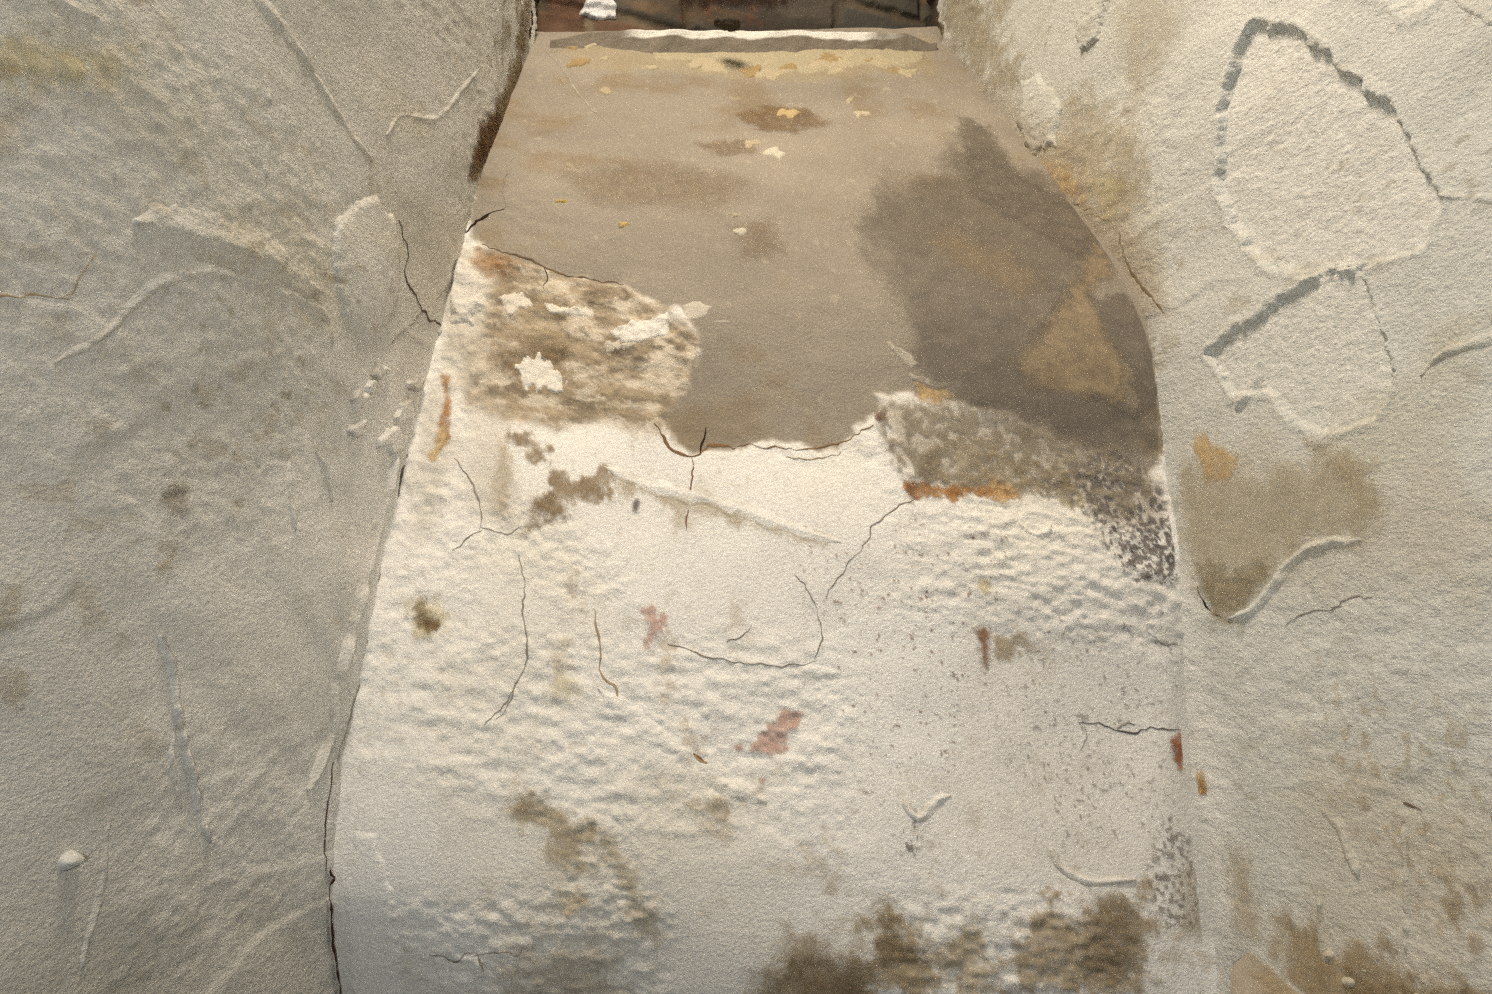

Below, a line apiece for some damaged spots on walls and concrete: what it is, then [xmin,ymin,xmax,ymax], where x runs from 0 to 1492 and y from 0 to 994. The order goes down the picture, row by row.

spalling [1214,26,1443,434]
peeling [513,352,568,393]
peeling [498,292,594,318]
peeling [596,312,669,353]
leakage [869,118,1177,585]
peeling [654,341,1150,517]
crack [685,458,694,529]
crack [667,499,914,668]
crack [594,609,618,697]
crack [1079,722,1180,750]
leakage [758,819,1199,994]
leakage [1260,915,1485,994]